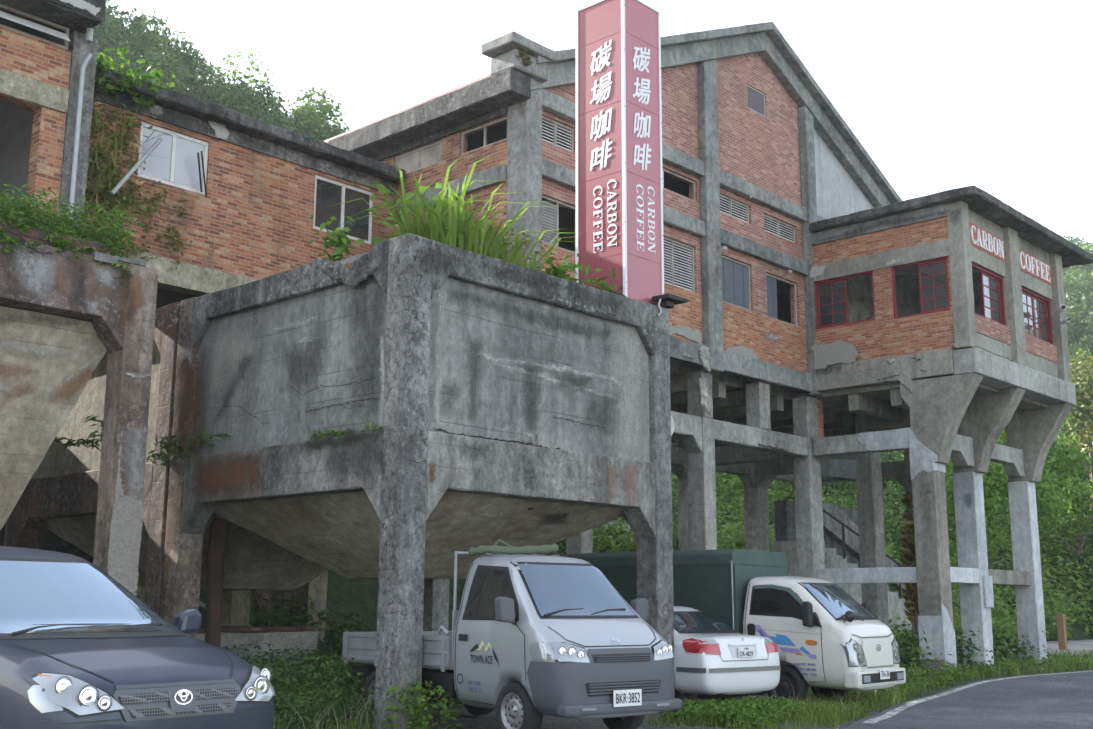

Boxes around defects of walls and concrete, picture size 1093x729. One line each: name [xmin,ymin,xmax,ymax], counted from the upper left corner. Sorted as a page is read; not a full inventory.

peeling [60,0,101,15]
rust [55,369,93,399]
spalling [107,431,145,595]